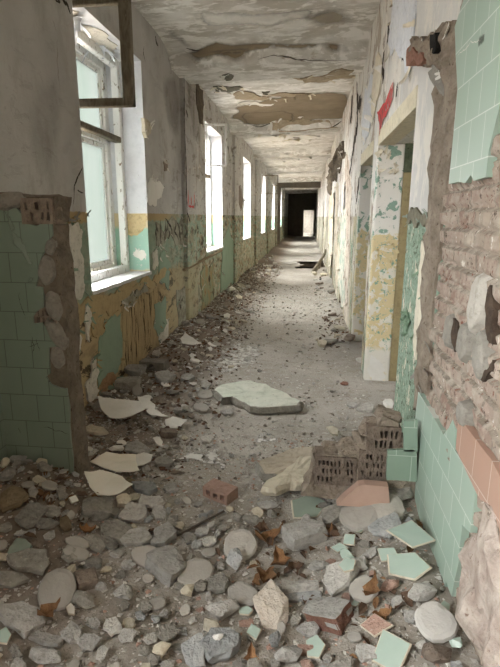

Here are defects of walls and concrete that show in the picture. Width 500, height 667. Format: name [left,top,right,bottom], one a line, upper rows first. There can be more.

crack [258,55,353,63]
flaking render [293,68,356,83]
flaking render [196,73,316,124]
flaking render [246,117,337,142]
peeling [147,175,165,207]
flaking render [358,0,457,410]
peeling [200,229,240,311]
peeling [68,210,187,403]
spalling [485,285,500,345]
spalling [451,318,460,352]
spalling [480,360,497,382]